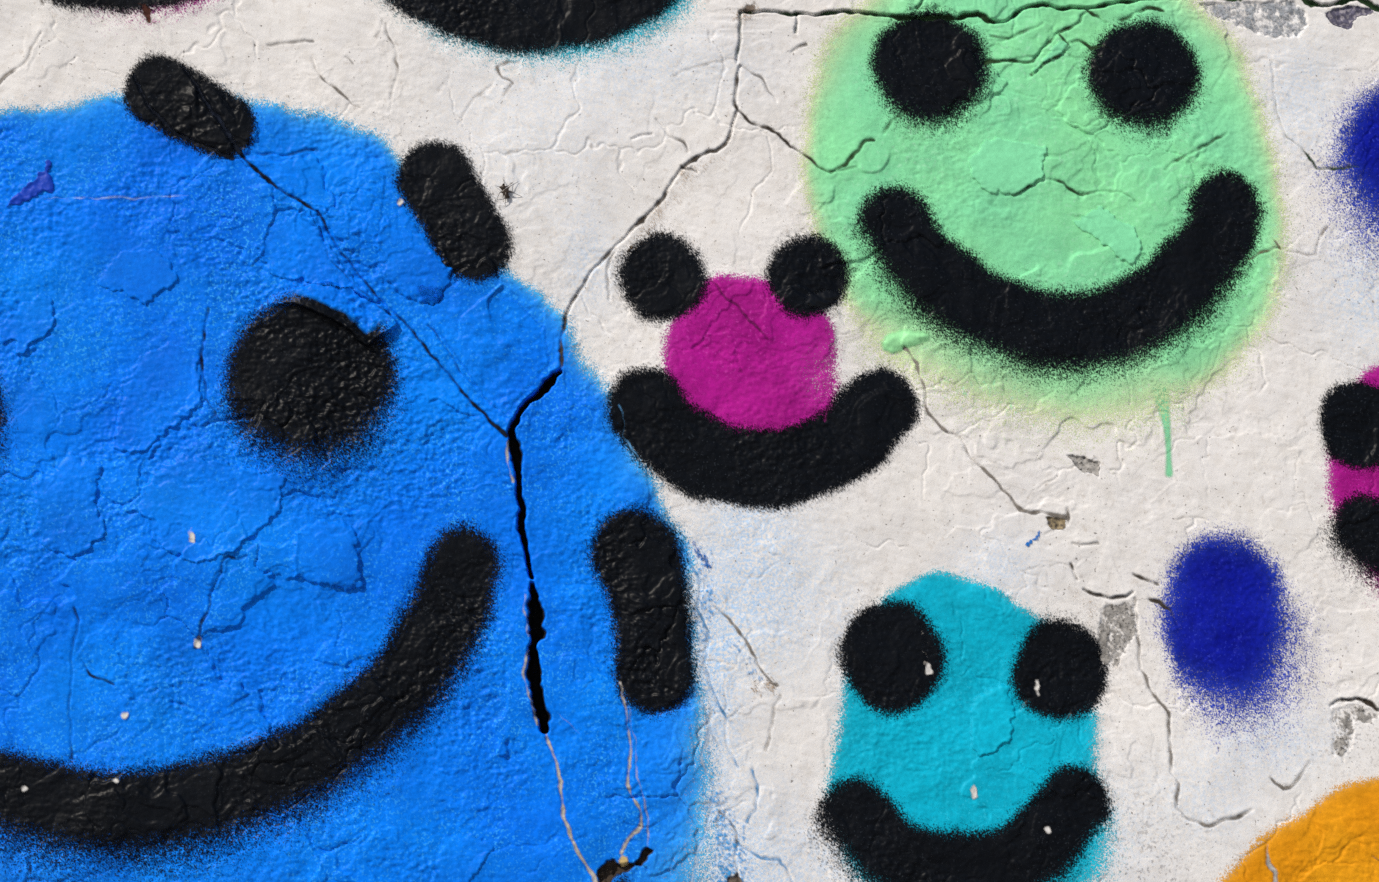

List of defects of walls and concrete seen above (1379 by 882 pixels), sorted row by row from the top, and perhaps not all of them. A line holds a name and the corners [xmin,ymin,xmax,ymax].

flaking render [1205,1,1307,37]
crack [1302,0,1379,12]
crack [1305,152,1350,170]
crack [135,0,1164,882]
flaking render [1098,603,1137,666]
crack [1070,543,1248,827]
crack [1340,698,1379,711]
crack [1270,775,1301,790]
crack [1266,852,1277,882]